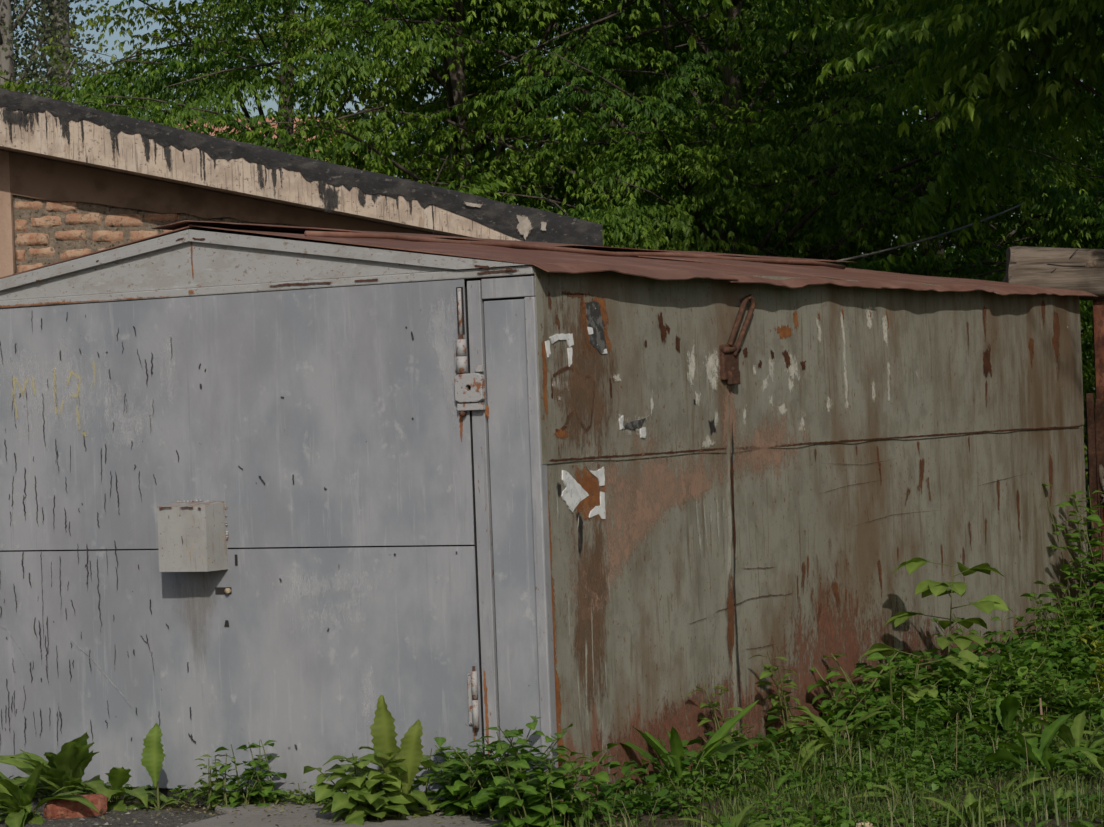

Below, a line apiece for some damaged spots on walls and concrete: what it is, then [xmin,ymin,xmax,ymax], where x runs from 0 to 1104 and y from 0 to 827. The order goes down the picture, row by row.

corrosion [260,282,331,291]
corrosion [474,265,519,274]
peeling [686,346,720,405]
peeling [752,351,801,415]
corrosion [541,287,1079,505]
peeling [563,409,746,712]
corrosion [545,481,1031,794]